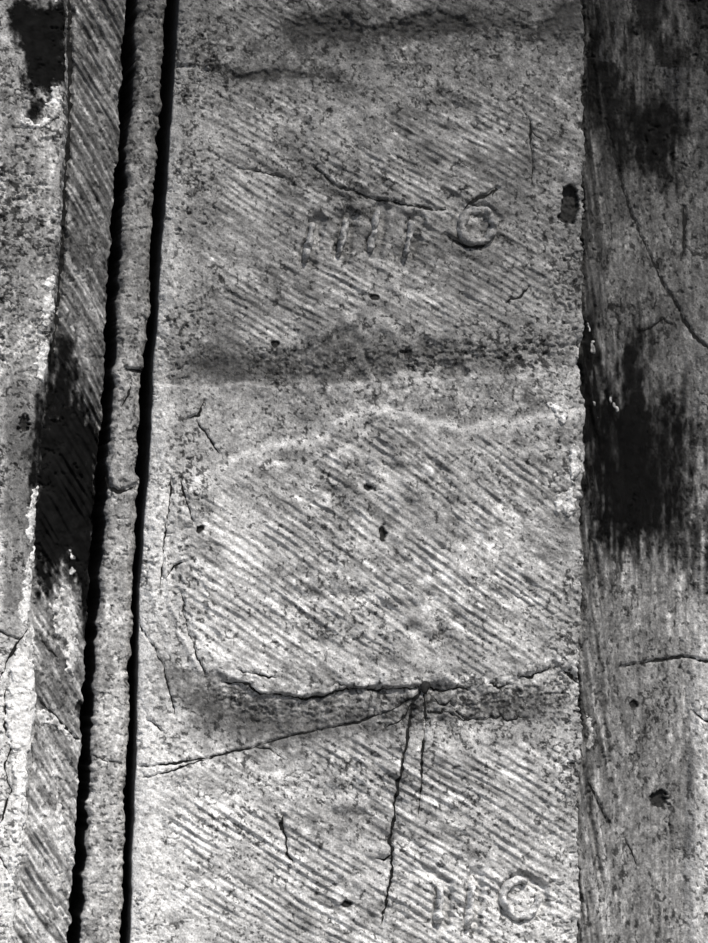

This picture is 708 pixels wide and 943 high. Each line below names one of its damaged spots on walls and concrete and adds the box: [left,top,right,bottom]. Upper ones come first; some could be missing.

water stain [7,0,66,122]
water stain [23,334,99,640]
crack [105,477,136,494]
water stain [579,315,708,572]
crack [39,699,118,763]
crack [139,478,581,923]
crack [624,655,708,667]